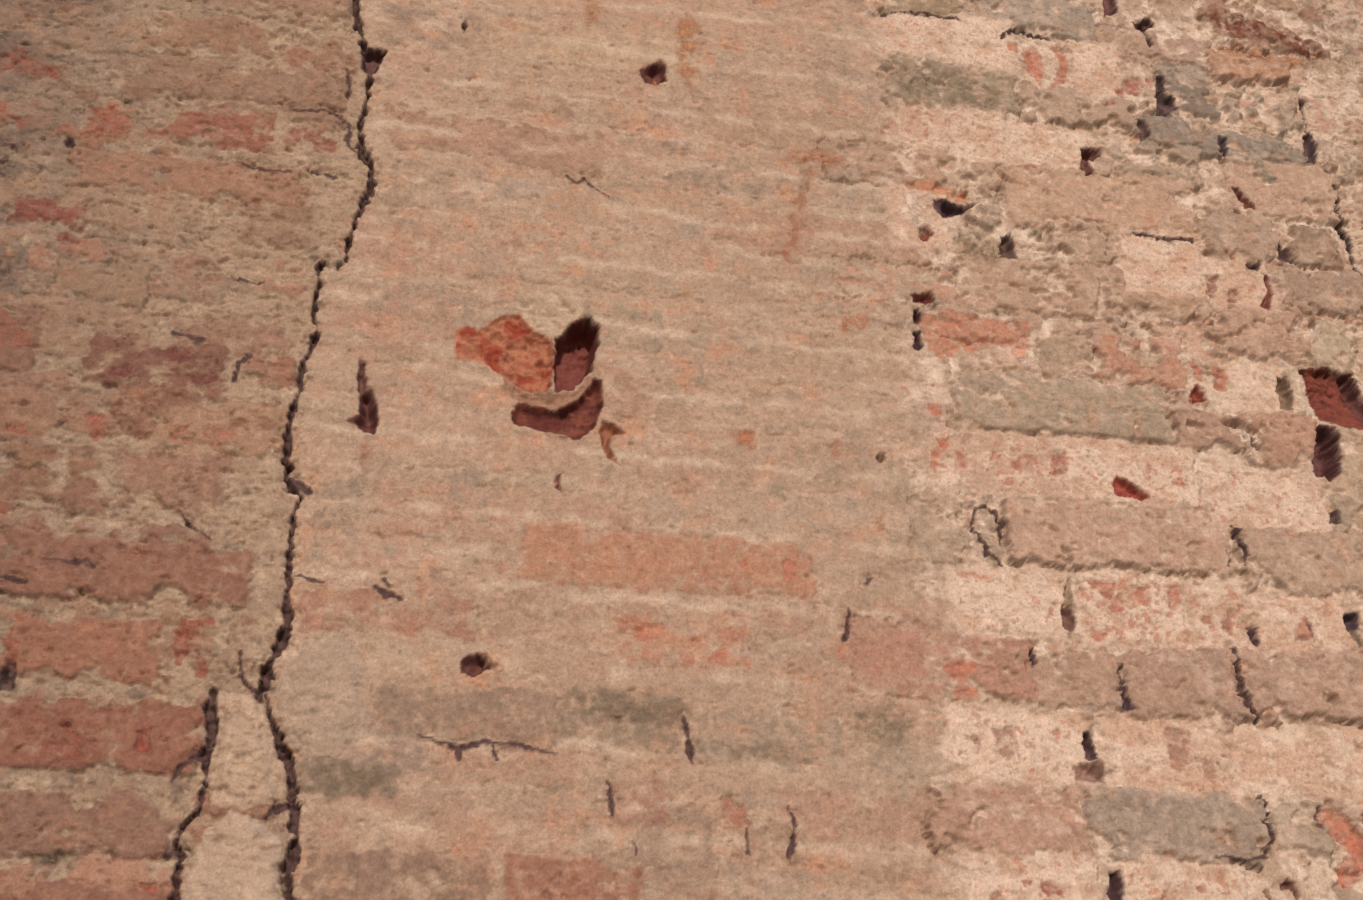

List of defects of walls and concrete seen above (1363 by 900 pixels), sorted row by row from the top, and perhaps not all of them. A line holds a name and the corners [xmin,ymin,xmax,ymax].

spalling [636,58,669,87]
spalling [452,285,630,466]
spalling [1288,364,1363,431]
crack [159,0,386,900]
spalling [458,649,505,678]
crack [415,727,560,766]
spalling [1317,803,1363,888]